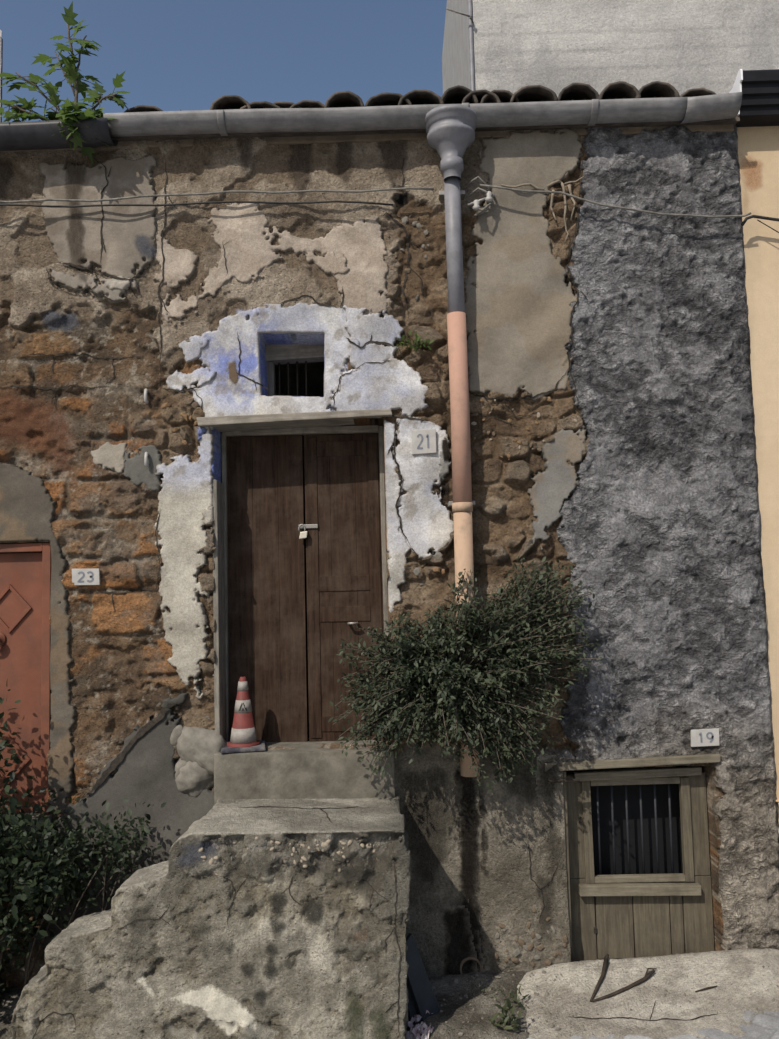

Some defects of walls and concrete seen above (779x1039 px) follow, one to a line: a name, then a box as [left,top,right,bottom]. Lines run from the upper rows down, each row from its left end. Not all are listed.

leakage [290,144,311,196]
leakage [379,140,404,181]
peeling [464,128,587,460]
crack [237,334,272,393]
crack [333,334,407,403]
peeling [39,155,454,699]
crack [387,408,428,553]
crack [220,876,248,924]
leakage [407,767,488,975]
spalling [170,986,275,1039]